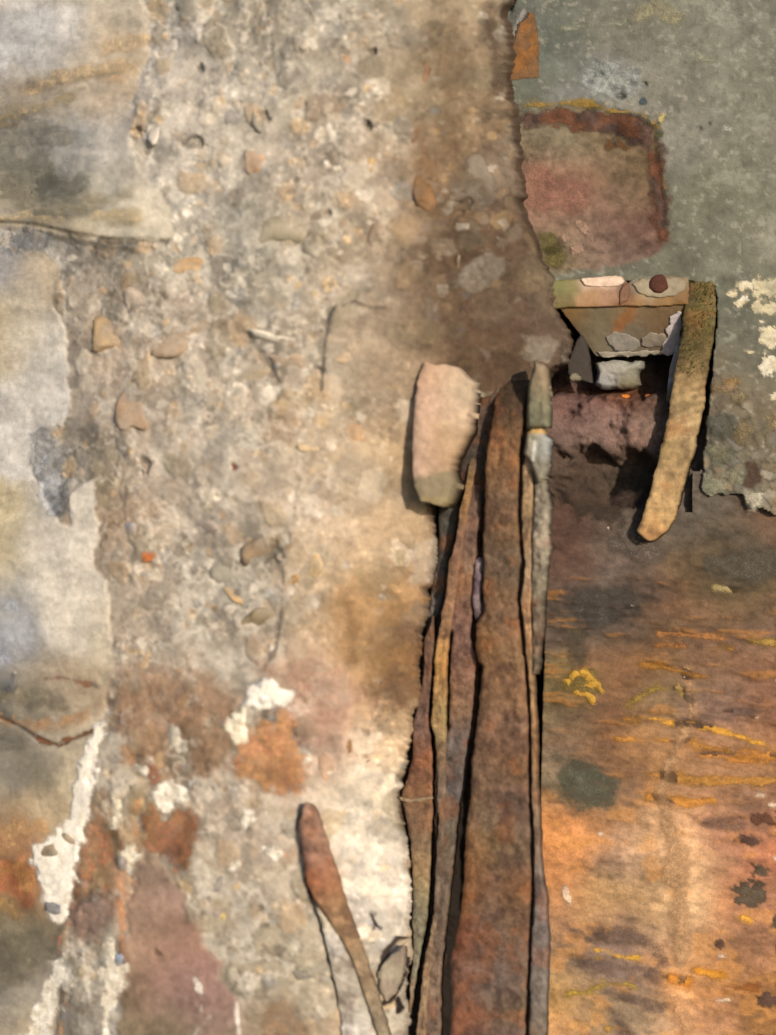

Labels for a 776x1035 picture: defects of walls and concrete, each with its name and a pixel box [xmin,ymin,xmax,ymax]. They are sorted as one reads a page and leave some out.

rust [510,9,539,80]
peeling [581,61,647,105]
rust [517,99,673,241]
peeling [581,276,694,304]
spalling [545,311,682,509]
spalling [0,0,580,1035]
rust [566,483,663,566]
rust [399,380,554,1035]
rust [234,709,306,795]
rust [135,801,198,871]
crack [370,914,411,1014]
rust [567,927,759,1012]